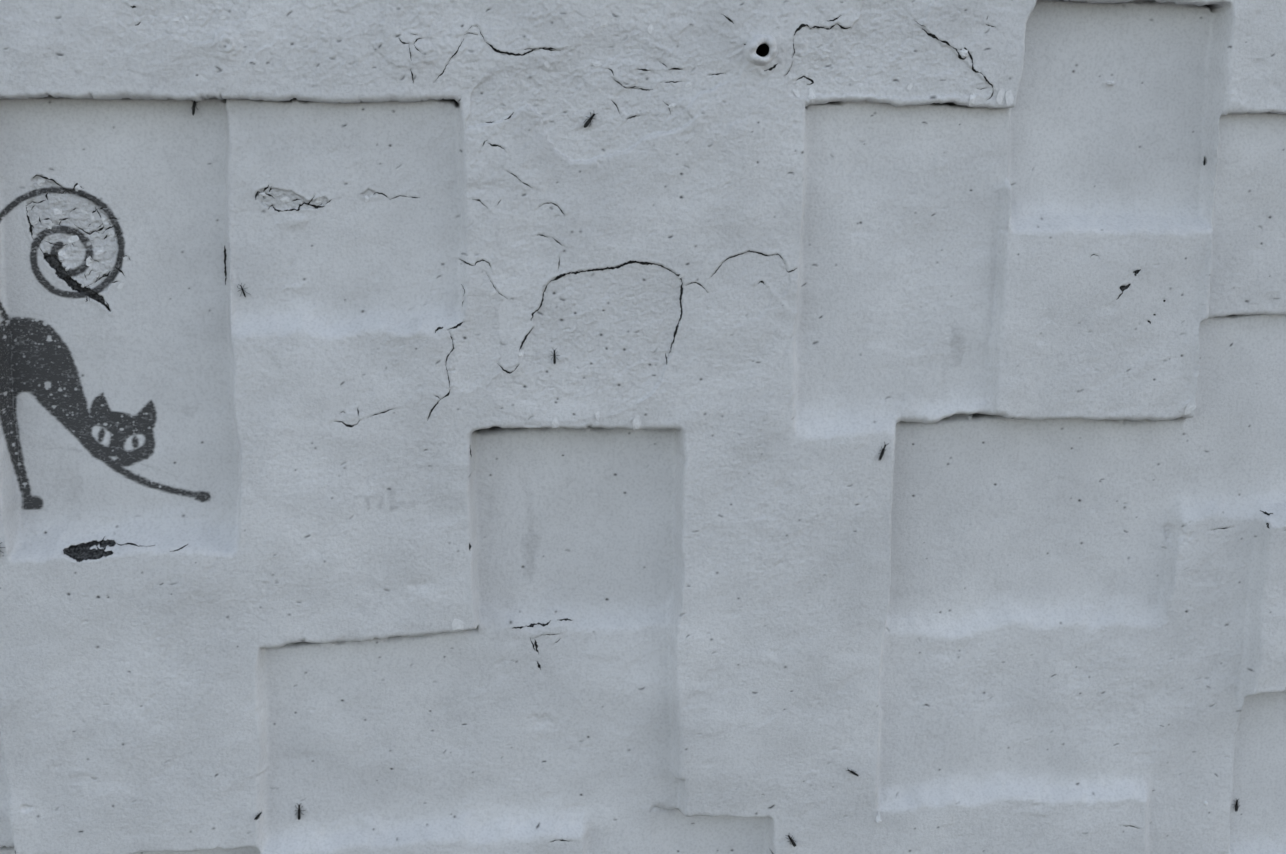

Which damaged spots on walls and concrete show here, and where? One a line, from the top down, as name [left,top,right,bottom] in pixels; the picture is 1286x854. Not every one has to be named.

crack [400,26,558,82]
crack [917,17,995,100]
crack [607,61,682,119]
flaking render [255,185,331,212]
crack [473,113,564,271]
flaking render [26,175,130,312]
crack [221,246,229,285]
crack [688,250,797,290]
crack [427,259,506,421]
crack [334,409,392,427]